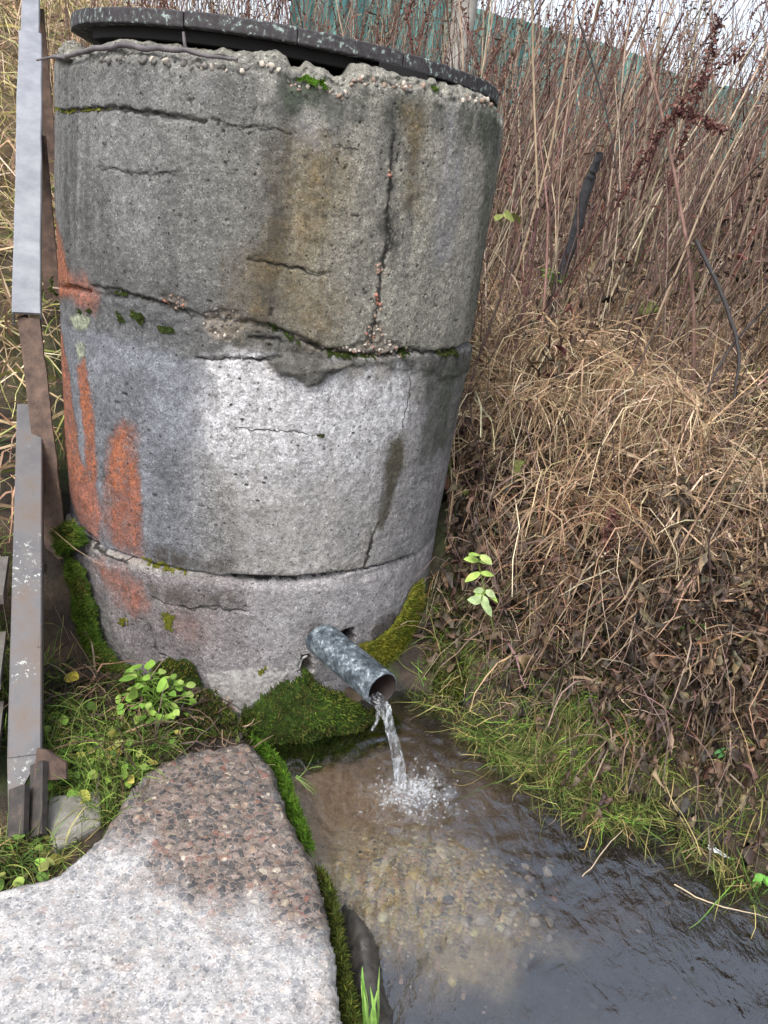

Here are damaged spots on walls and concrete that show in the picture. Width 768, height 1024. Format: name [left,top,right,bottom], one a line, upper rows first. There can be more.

crack [64,106,286,134]
rust [55,217,93,307]
rust [60,330,140,546]
peeling [110,262,423,506]
crack [197,140,459,436]
leakage [377,439,403,529]